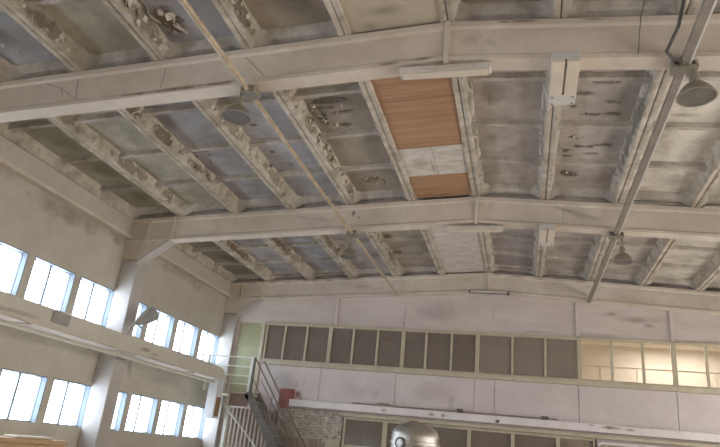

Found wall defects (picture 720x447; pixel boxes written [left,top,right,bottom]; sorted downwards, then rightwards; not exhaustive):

peeling [124,0,188,56]
peeling [127,107,173,146]
peeling [284,90,355,200]